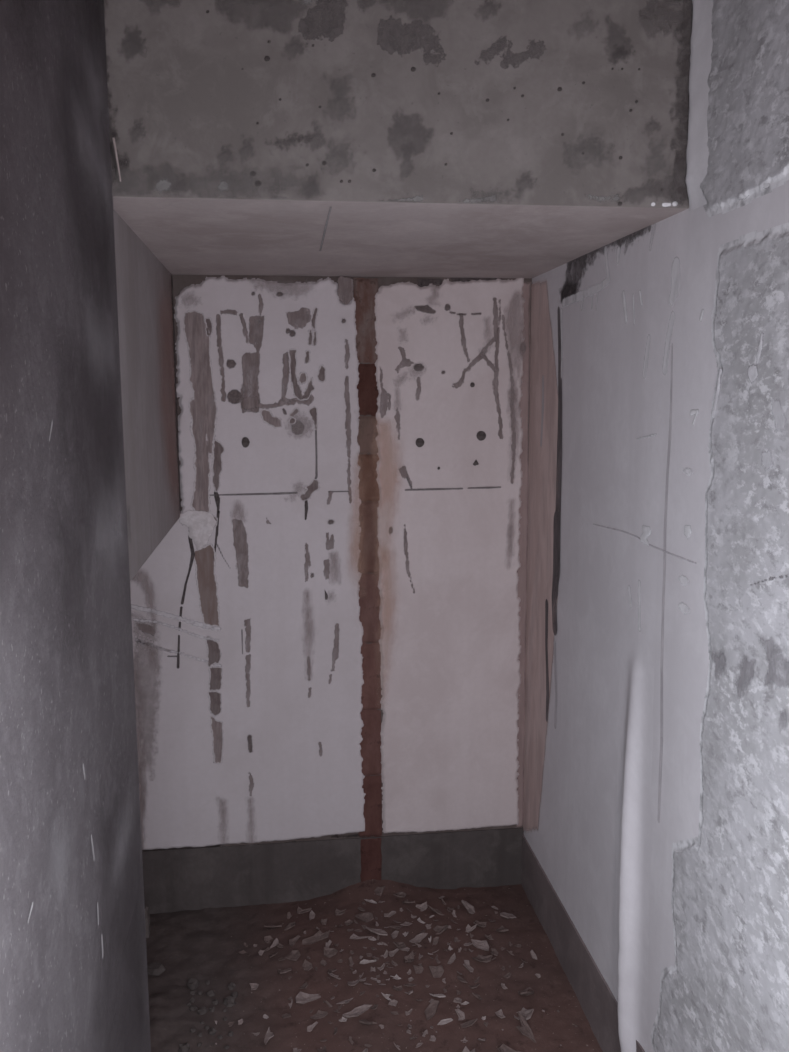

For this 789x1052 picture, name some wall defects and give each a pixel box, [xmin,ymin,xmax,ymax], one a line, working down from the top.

damp [625,0,693,203]
damp [216,292,319,479]
damp [131,572,221,667]
crack [167,492,298,669]
damp [232,506,249,588]
damp [241,619,251,707]